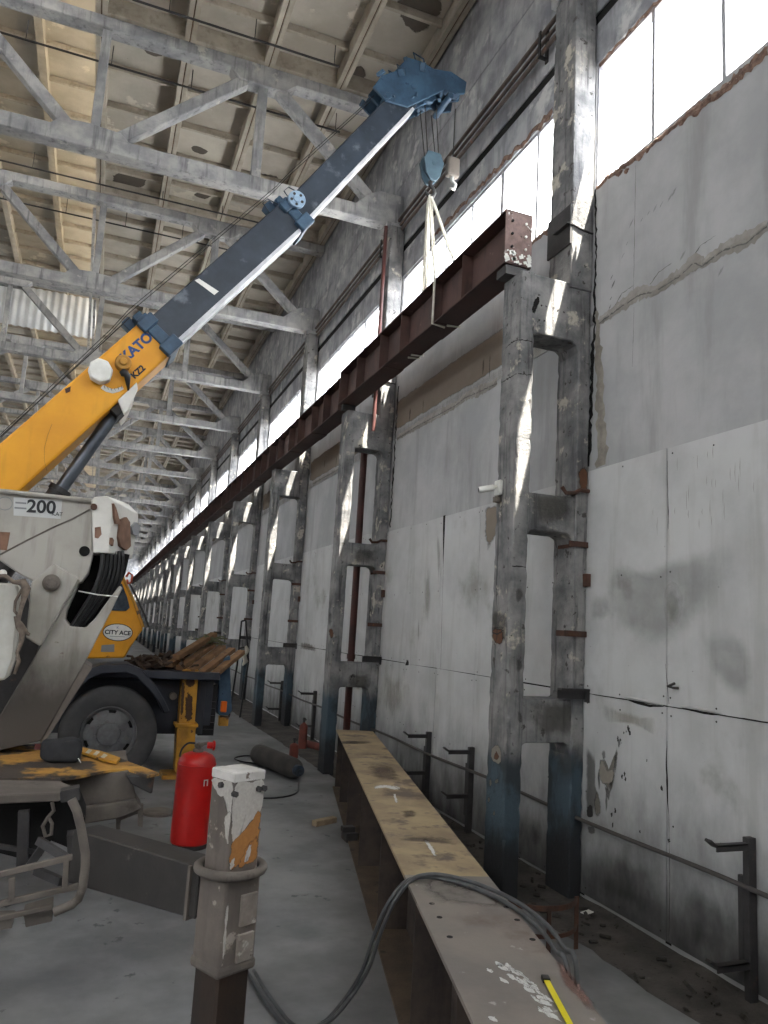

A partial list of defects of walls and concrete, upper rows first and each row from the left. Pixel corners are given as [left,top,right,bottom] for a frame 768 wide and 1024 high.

spalling [596,46,768,190]
crack [588,189,609,468]
corrosion [578,468,588,489]
peeling [598,725,631,828]